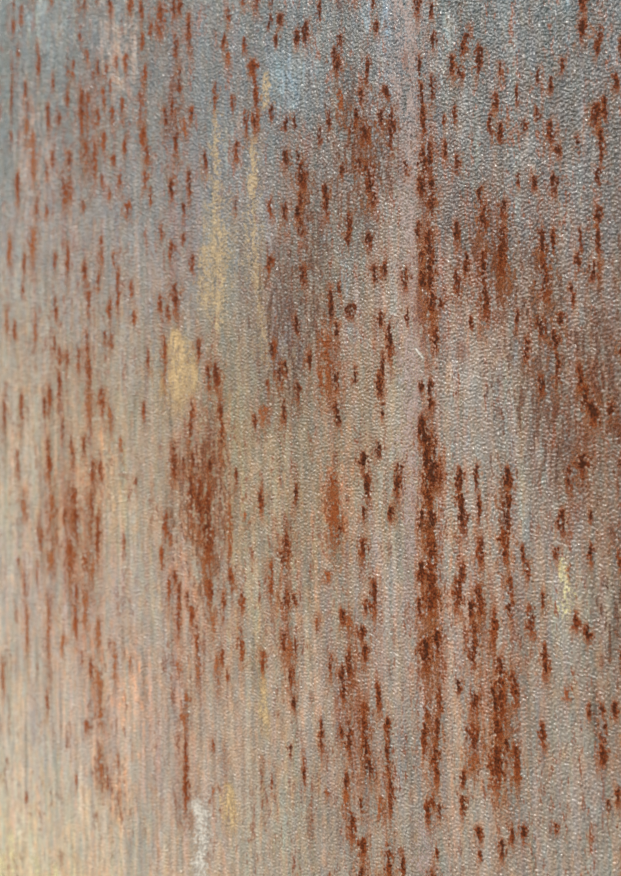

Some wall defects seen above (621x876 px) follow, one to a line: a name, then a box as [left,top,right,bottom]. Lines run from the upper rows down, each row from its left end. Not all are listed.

corrosion [45,32,152,205]
corrosion [127,0,194,156]
corrosion [230,36,297,162]
corrosion [348,57,396,150]
corrosion [400,54,461,354]
corrosion [450,185,508,331]
corrosion [590,72,620,186]
corrosion [16,418,103,666]
corrosion [168,338,246,633]
corrosion [328,580,380,703]
corrosion [415,378,531,828]
corrosion [338,681,397,820]